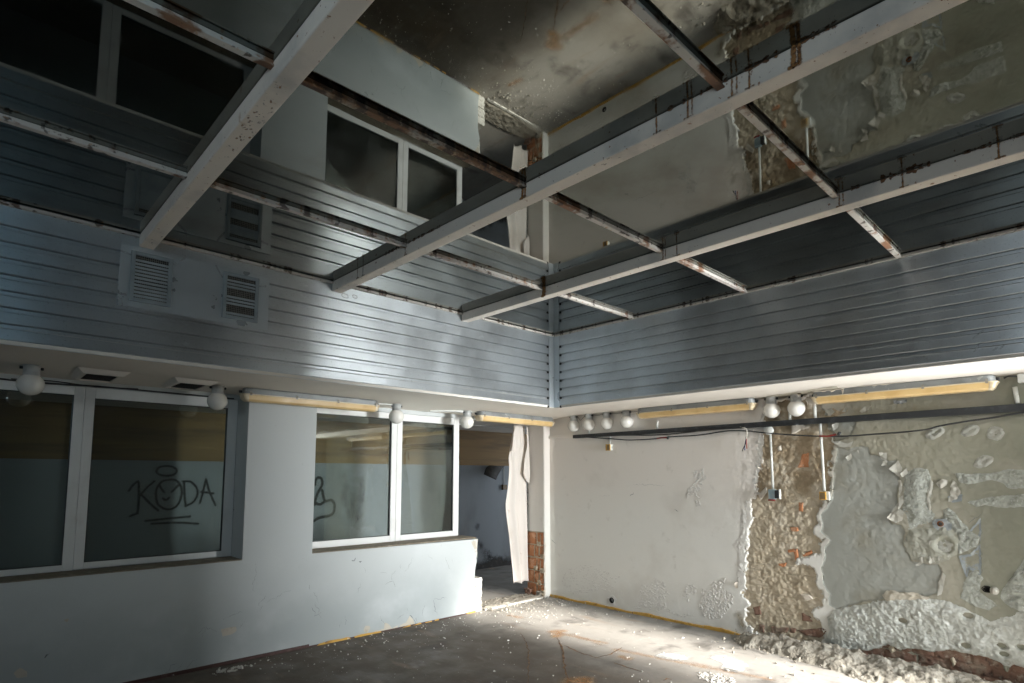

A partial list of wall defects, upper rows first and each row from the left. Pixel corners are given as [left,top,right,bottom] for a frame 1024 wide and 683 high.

rust [787,43,802,70]
flaking render [524,530,545,596]
spalling [734,386,1024,683]